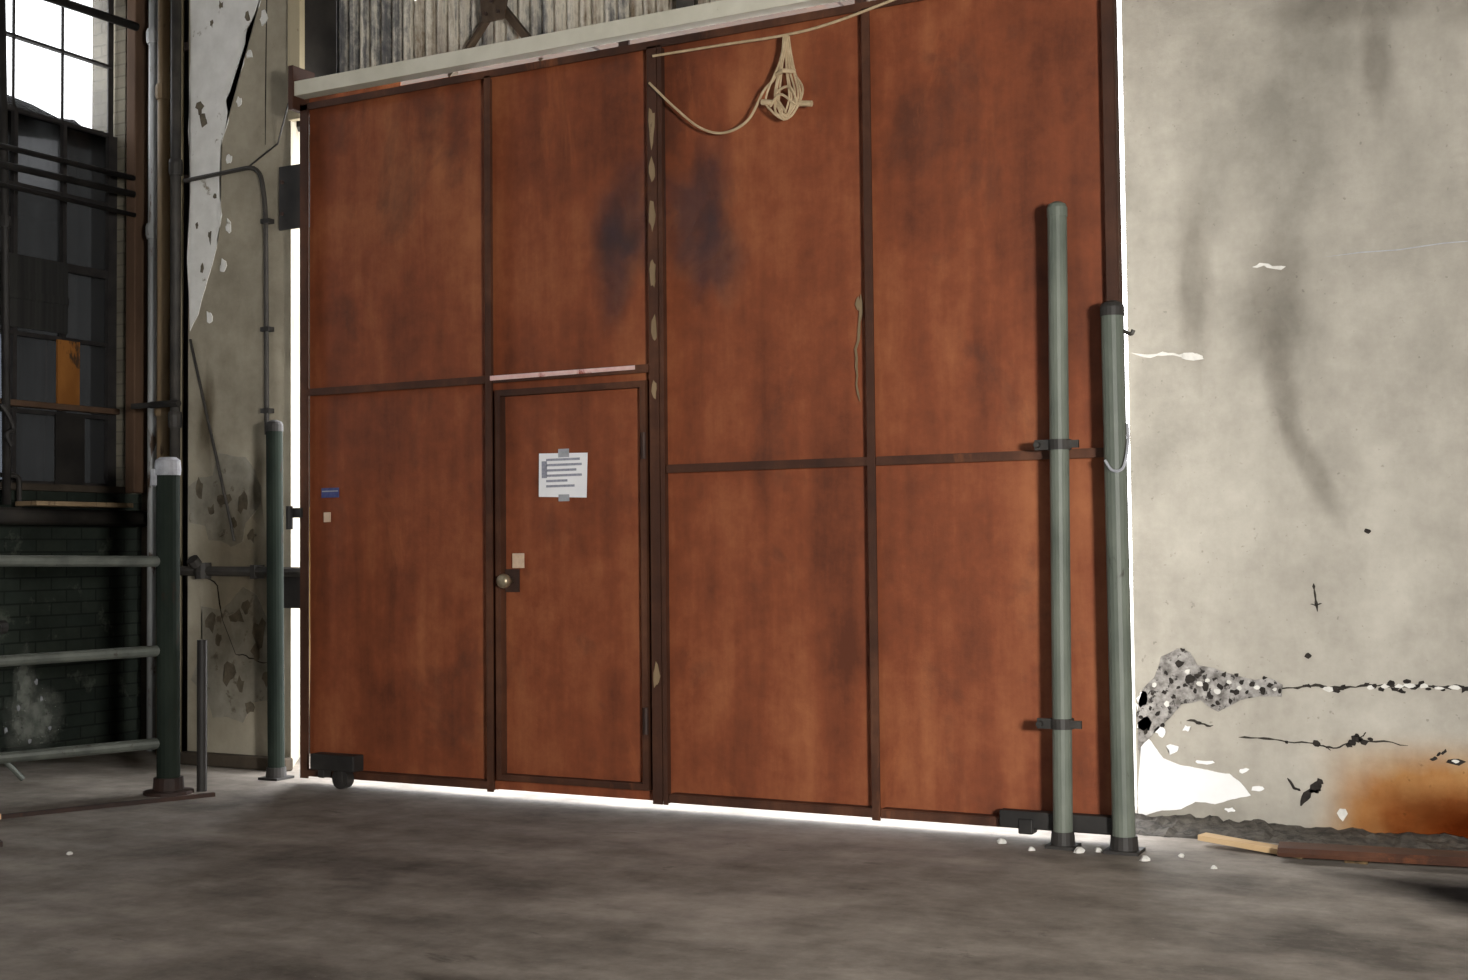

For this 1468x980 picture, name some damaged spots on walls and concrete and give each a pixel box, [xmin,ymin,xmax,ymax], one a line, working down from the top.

spalling [1136,648,1283,815]
spalling [1430,749,1466,766]
spalling [1287,778,1324,806]